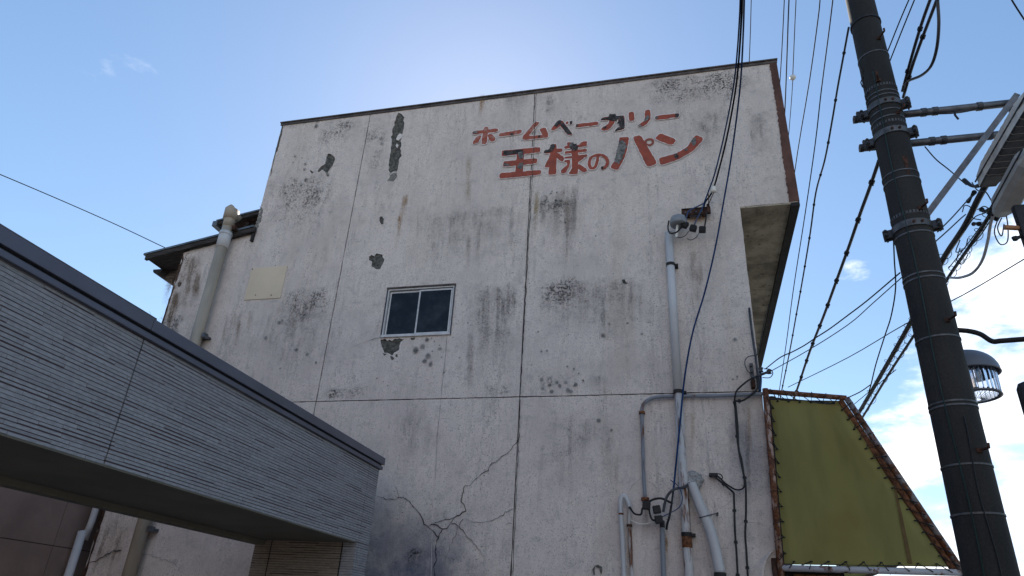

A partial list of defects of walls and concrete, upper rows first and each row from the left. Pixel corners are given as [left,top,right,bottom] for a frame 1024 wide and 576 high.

flaking render [387,112,405,182]
flaking render [310,150,335,176]
flaking render [368,253,385,270]
flaking render [379,337,415,360]
crack [378,102,536,576]